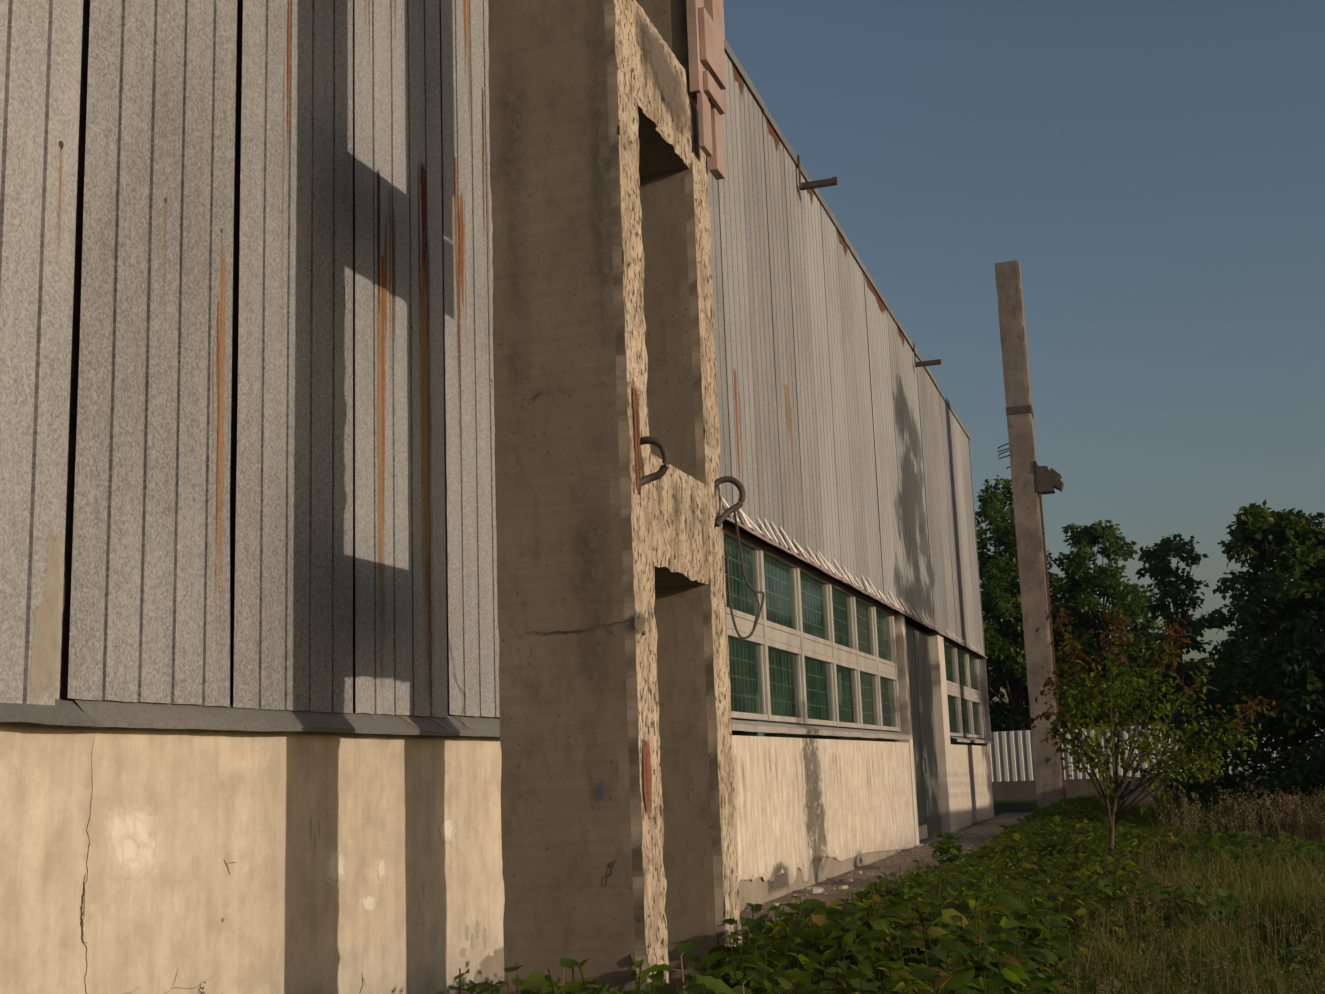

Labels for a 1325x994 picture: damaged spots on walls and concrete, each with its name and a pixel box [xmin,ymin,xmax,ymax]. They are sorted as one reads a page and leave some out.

rust [463,0,489,233]
rust [213,260,226,532]
rust [377,169,396,588]
rust [418,164,431,698]
rust [454,158,466,379]
spalling [632,380,641,495]
crack [80,735,95,994]
spalling [431,921,505,994]
spalling [739,851,895,912]